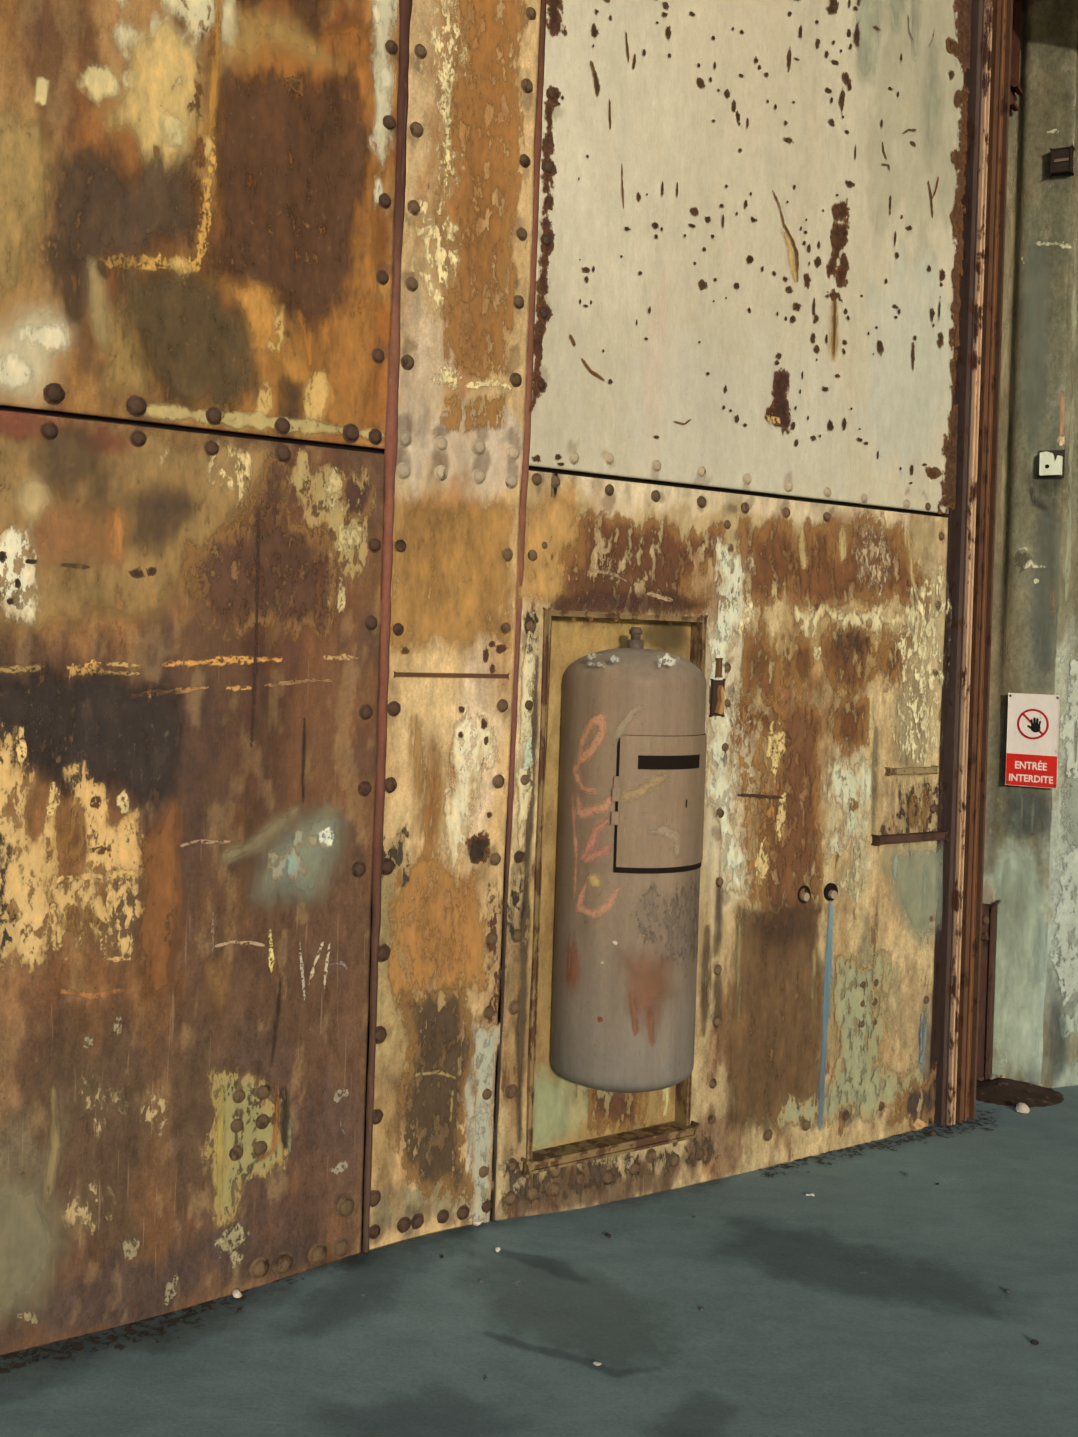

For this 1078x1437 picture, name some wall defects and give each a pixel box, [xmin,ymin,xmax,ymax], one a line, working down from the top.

rust [0,0,381,431]
peeling [412,0,467,311]
rust [529,85,561,412]
rust [765,353,795,434]
rust [825,198,850,358]
rust [926,0,972,515]
peeling [0,723,145,973]
rust [390,498,937,1142]
peeling [704,537,755,898]
peeling [794,564,950,904]
flaking render [1050,655,1078,1038]
peeling [200,1069,289,1268]